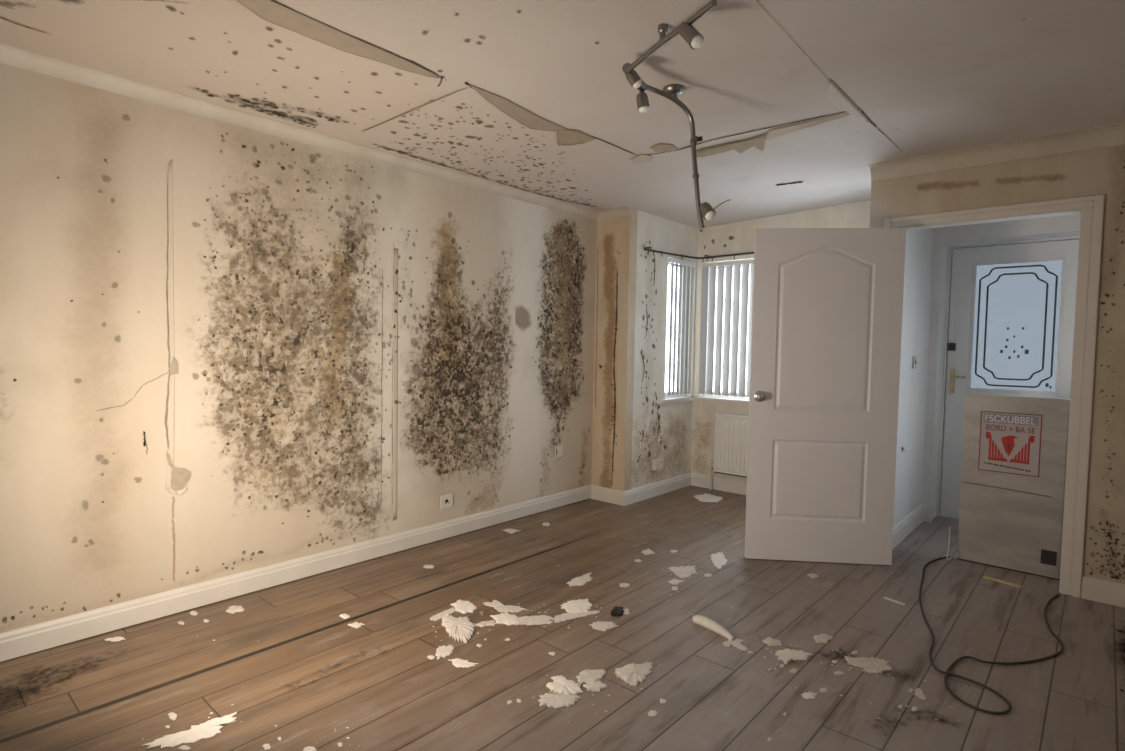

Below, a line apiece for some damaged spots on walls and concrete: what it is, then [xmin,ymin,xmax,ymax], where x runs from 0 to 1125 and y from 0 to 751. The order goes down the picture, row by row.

damp [374,100,597,207]
damp [198,161,514,547]
damp [532,220,586,457]
damp [637,241,666,462]
damp [1087,390,1125,579]